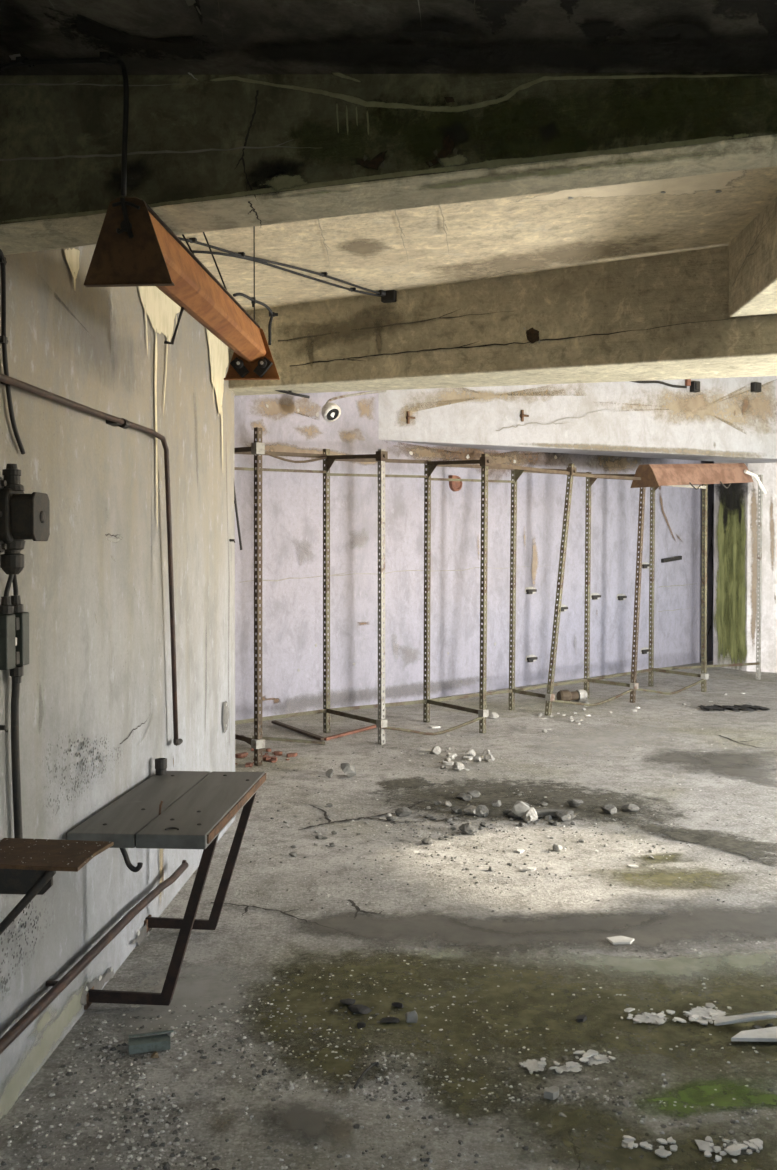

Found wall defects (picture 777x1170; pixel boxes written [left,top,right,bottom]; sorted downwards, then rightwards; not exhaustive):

damp [210,0,777,144]
damp [247,160,299,196]
damp [650,750,777,785]
crack [298,797,448,830]
damp [301,906,777,977]
damp [264,1102,352,1148]